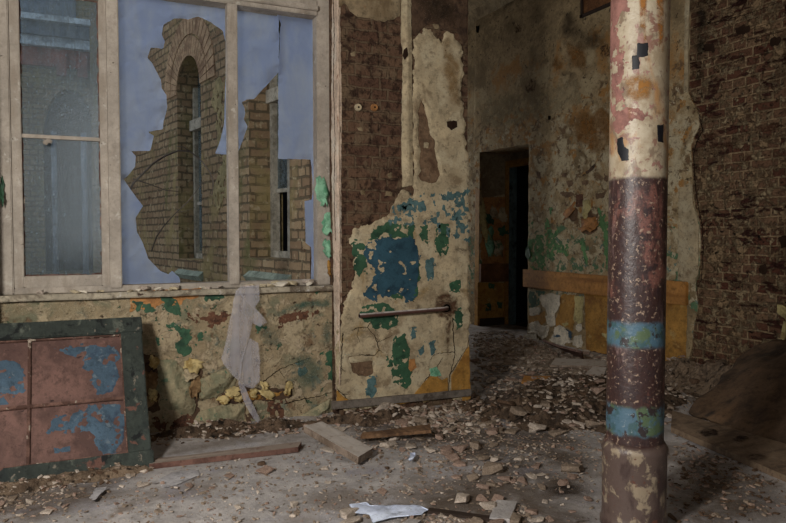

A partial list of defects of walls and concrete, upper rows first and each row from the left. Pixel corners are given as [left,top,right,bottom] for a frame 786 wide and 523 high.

peeling [610,0,648,161]
flaking render [418,102,440,183]
peeling [527,164,608,271]
peeling [130,288,231,431]
flaking render [216,363,308,422]
flaking render [278,308,319,329]
peeling [319,350,332,381]
peeling [347,187,509,410]
crack [424,318,469,391]
peeling [523,290,607,355]
peeling [665,303,687,361]